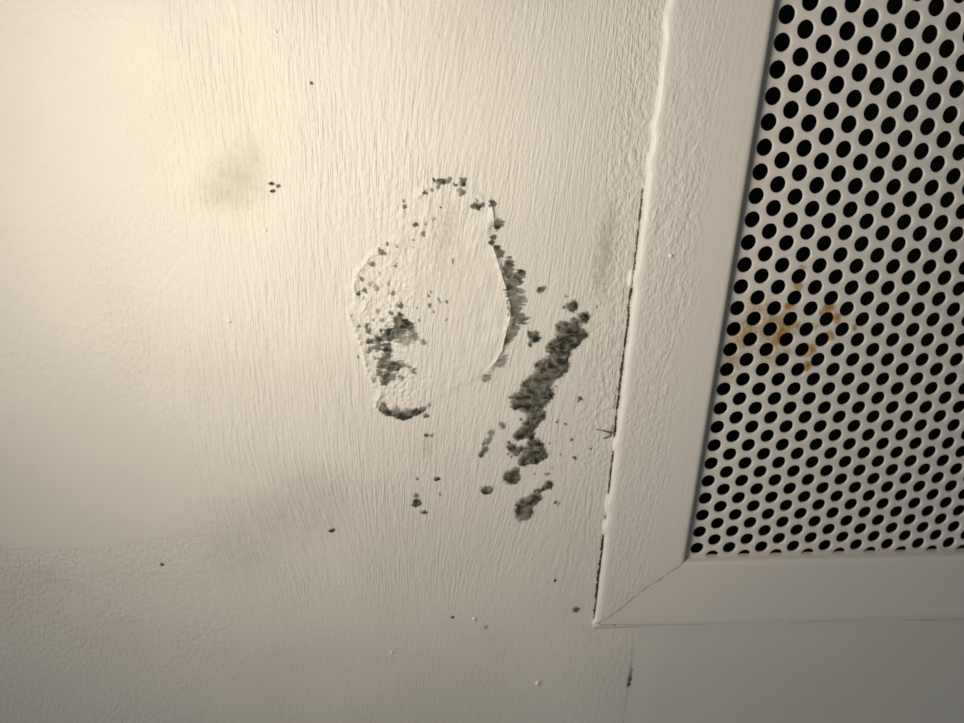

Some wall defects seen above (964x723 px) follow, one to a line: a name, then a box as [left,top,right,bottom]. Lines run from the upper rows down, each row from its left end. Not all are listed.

water stain [422,177,467,196]
water stain [470,199,497,211]
rust [727,303,799,366]
rust [819,303,841,340]
water stain [478,219,589,521]
rust [804,344,816,371]